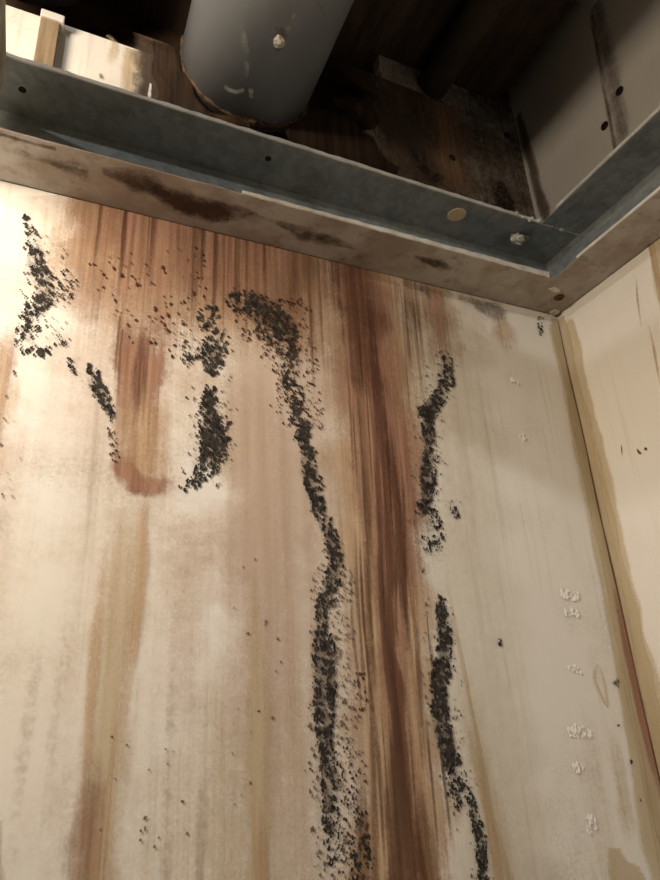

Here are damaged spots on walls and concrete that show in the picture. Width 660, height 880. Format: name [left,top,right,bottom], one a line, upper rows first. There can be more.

leakage [285,64,549,219]
leakage [14,200,375,880]
leakage [404,279,461,573]
leakage [421,594,512,880]